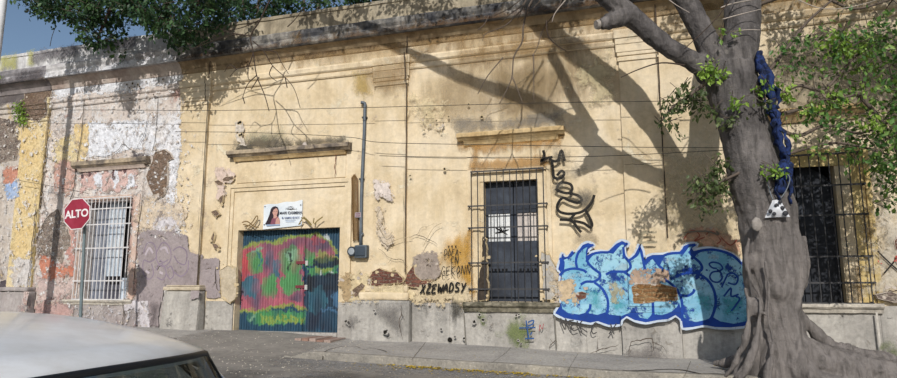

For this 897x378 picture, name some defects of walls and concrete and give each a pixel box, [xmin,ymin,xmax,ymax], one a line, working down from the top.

peeling [0,51,196,327]
peeling [373,179,395,249]
peeling [338,228,509,312]
spalling [608,268,678,304]
peeling [860,204,897,303]